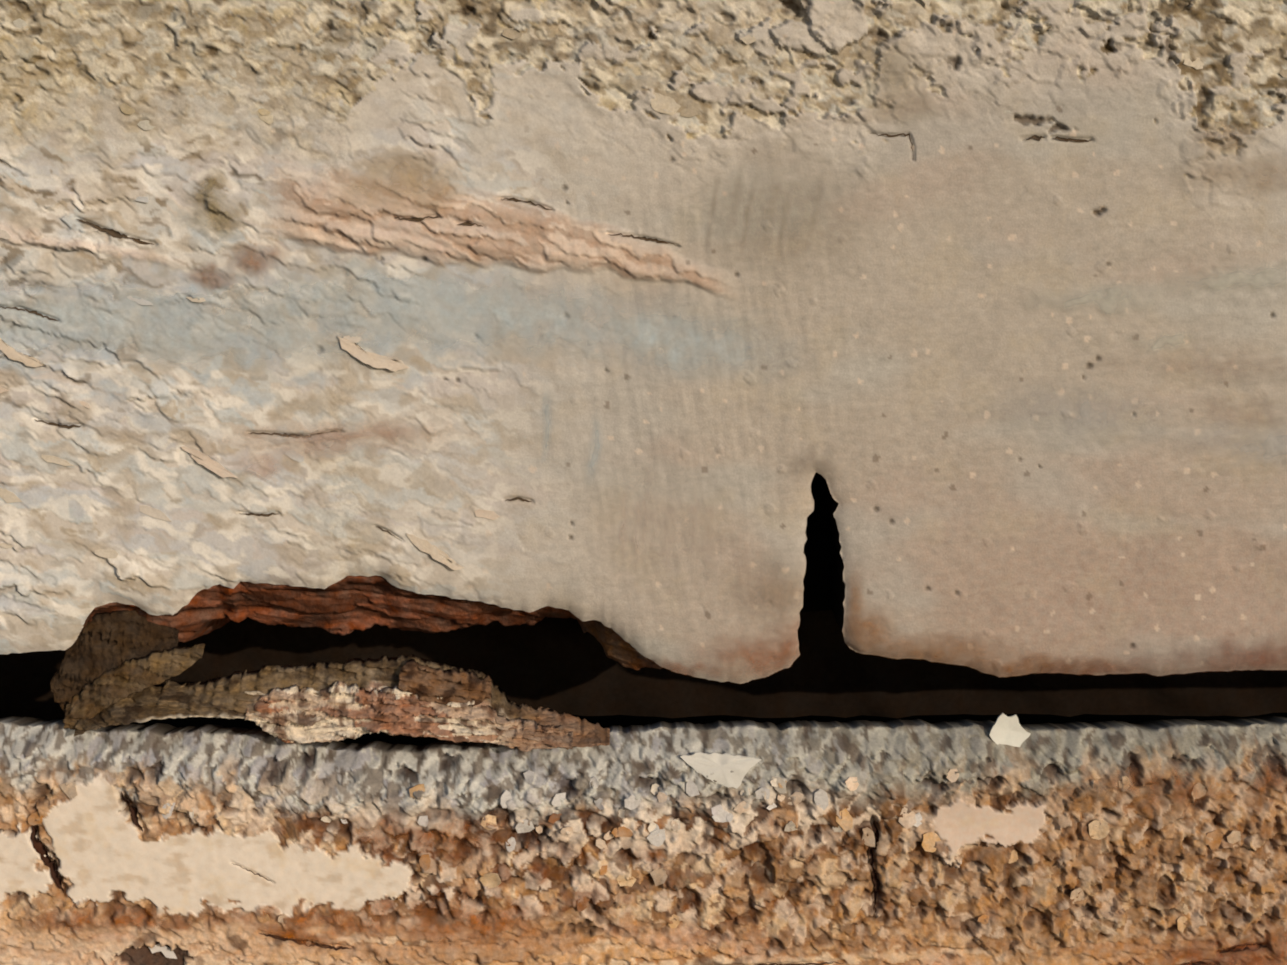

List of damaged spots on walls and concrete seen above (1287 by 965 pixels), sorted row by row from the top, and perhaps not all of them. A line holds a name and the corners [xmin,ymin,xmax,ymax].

spalling [1005,109,1076,136]
peeling [1066,0,1287,157]
spalling [1089,207,1107,218]
peeling [0,0,1054,752]
crack [161,472,1287,718]
crack [0,650,66,720]
peeling [0,713,1287,965]